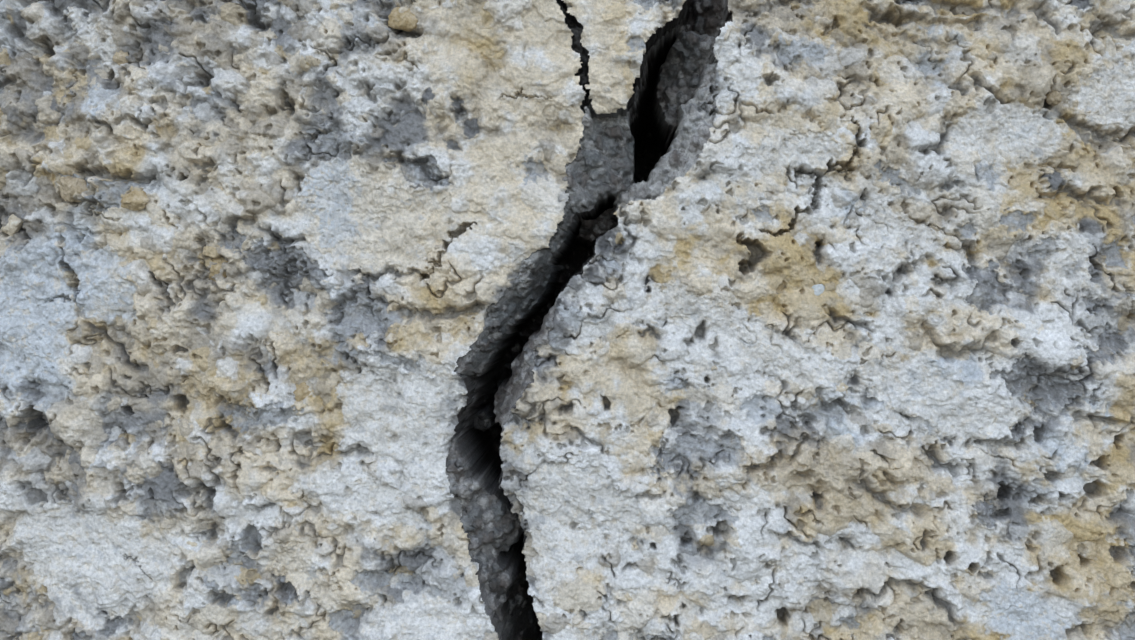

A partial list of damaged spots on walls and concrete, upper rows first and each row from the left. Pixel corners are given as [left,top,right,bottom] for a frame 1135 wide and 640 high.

crack [419,222,476,281]
crack [445,0,733,640]